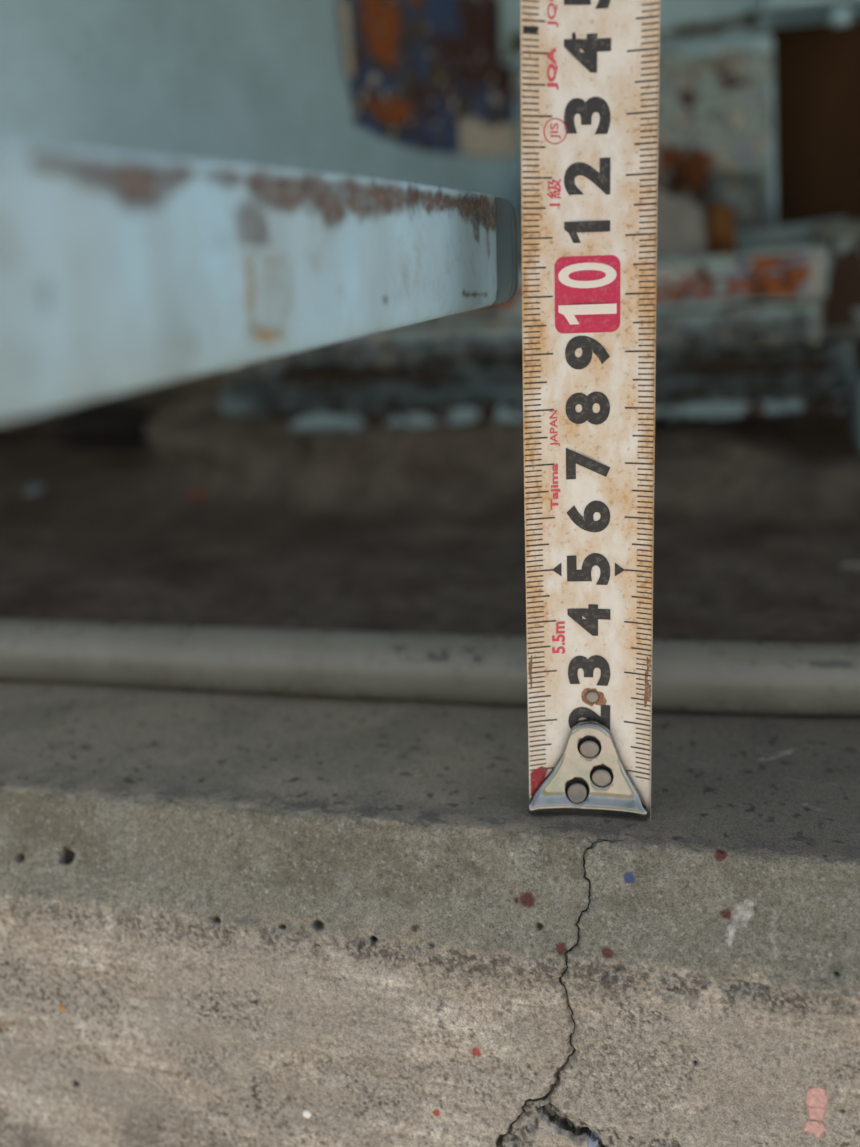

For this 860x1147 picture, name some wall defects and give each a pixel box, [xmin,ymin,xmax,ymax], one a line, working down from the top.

crack [496,839,621,1147]